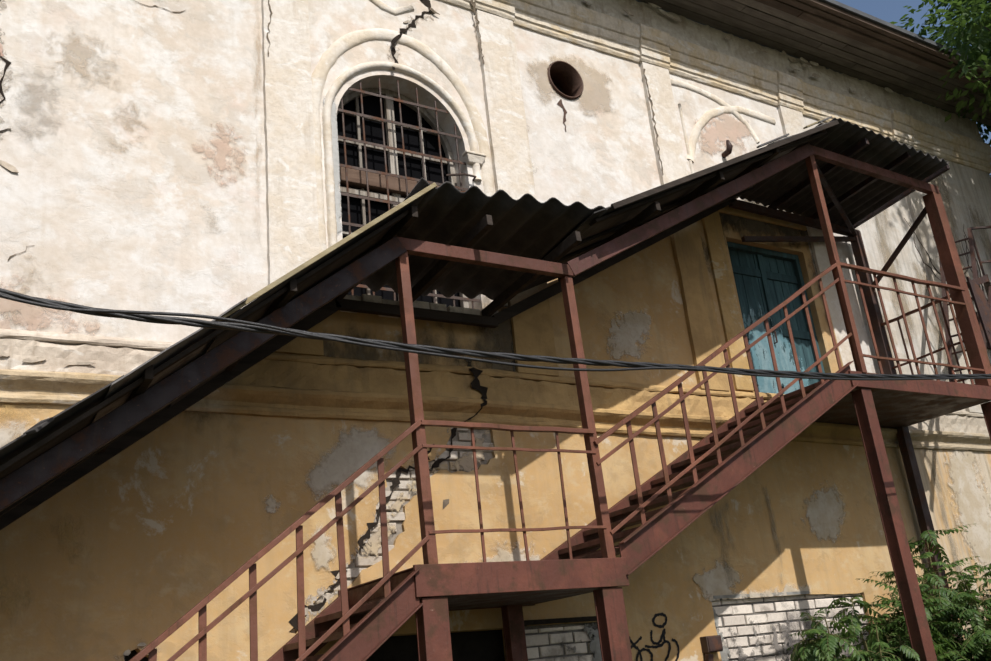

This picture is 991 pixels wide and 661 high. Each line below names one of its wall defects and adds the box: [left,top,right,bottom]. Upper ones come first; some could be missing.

crack [387,0,440,70]
crack [0,0,19,173]
peeling [607,311,651,359]
peeling [0,421,26,448]
spalling [428,427,494,477]
peeling [307,427,417,609]
crack [289,360,488,630]
peeling [803,485,846,543]
peeling [693,561,811,602]